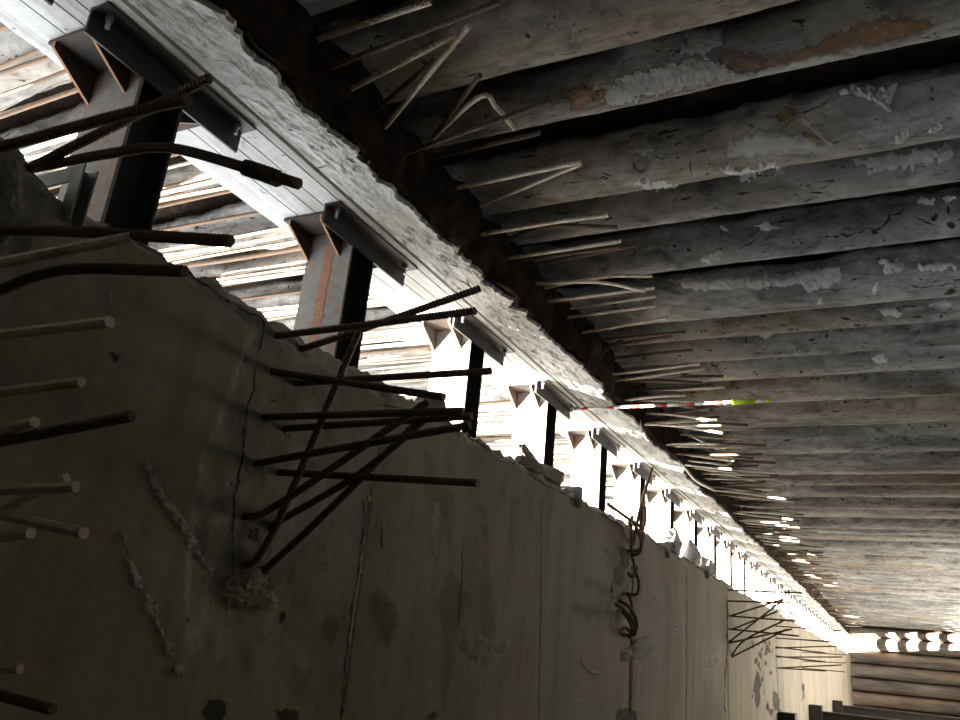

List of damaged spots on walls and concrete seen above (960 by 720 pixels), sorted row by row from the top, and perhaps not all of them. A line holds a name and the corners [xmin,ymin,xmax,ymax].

corrosion [732,16,932,70]
crack [136,241,265,567]
spalling [219,565,283,615]